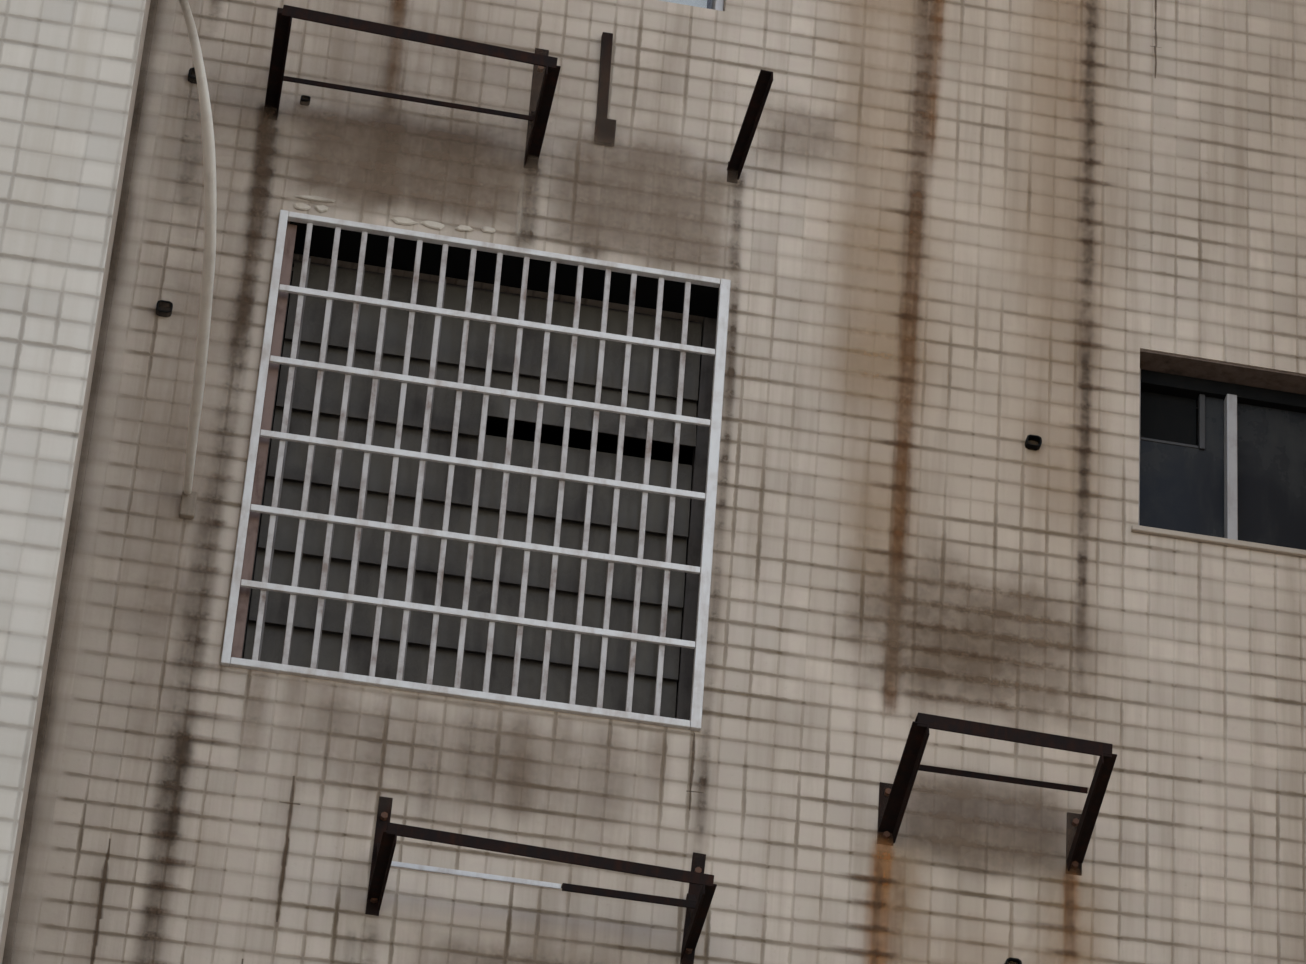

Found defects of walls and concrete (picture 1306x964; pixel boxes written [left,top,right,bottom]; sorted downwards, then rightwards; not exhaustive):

leakage [88,0,160,406]
corrosion [854,0,943,381]
corrosion [893,441,908,580]
leakage [18,442,87,861]
leakage [860,574,1079,710]
leakage [2,942,11,964]
leakage [144,755,188,941]
corrosion [848,843,906,964]